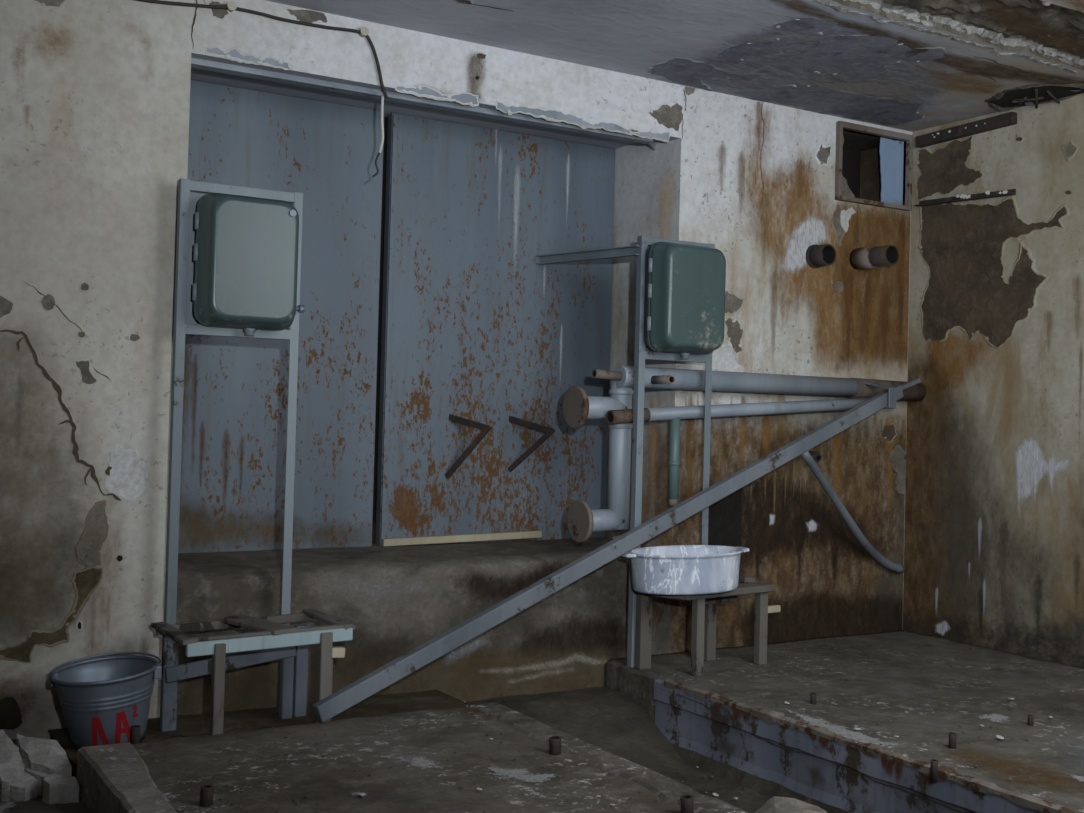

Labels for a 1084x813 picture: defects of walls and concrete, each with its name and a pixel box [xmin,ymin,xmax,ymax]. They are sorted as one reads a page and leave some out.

peeling [496,57,925,143]
flaking render [773,0,1084,111]
flaking render [915,123,1073,350]
flaking render [725,288,745,355]
flaking render [0,467,112,663]
crack [0,330,121,501]
corrosion [390,483,419,534]
corrosion [654,599,692,653]
corrosion [653,510,702,546]
corrosion [650,415,816,515]
corrosion [716,148,979,648]
leakage [745,527,1084,668]